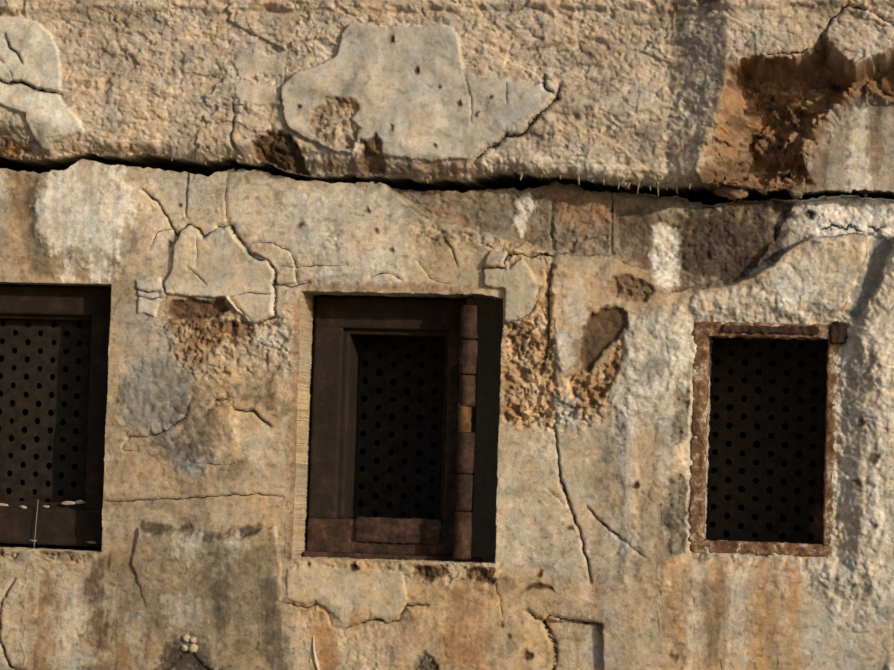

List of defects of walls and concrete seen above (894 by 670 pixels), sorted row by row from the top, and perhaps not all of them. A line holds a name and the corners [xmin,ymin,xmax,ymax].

spalling [713,52,810,191]
crack [146,175,339,325]
spalling [135,275,258,369]
leakage [549,390,591,438]
spalling [500,265,658,427]
leakage [593,85,894,670]
crack [546,426,591,580]
leakage [0,516,266,670]
leakage [252,560,377,670]
crack [281,602,426,628]
leakage [429,575,500,670]
crack [527,611,602,670]